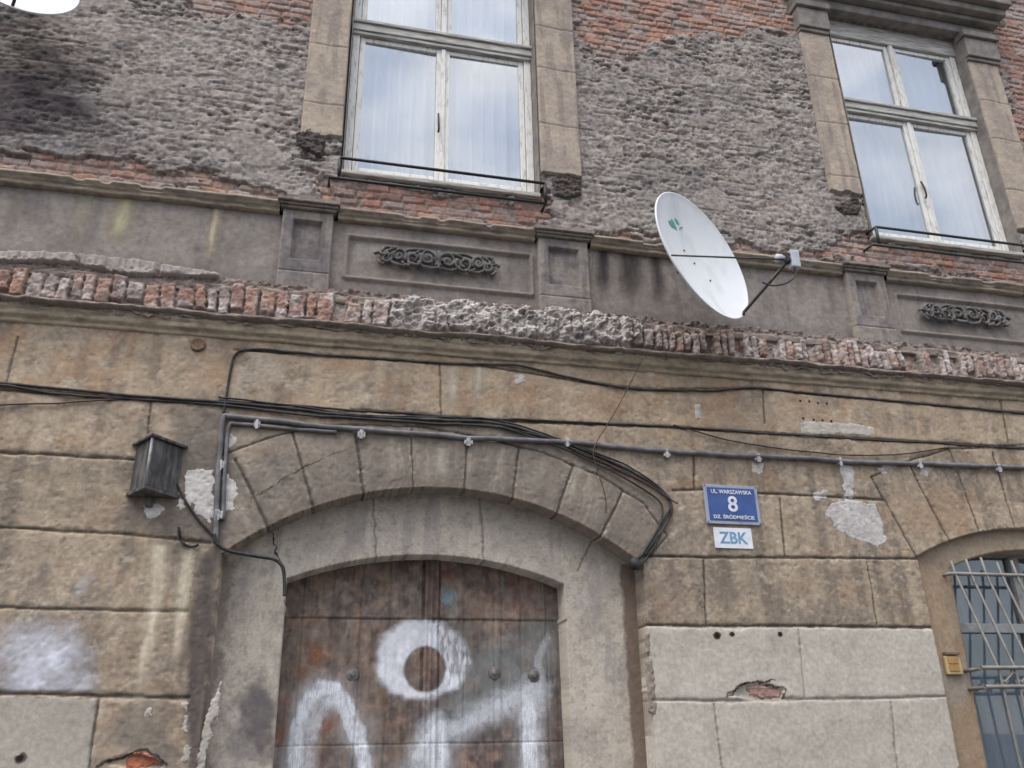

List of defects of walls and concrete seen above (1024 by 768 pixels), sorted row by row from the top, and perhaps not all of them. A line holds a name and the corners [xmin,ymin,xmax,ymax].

flaking render [187,0,313,32]
spalling [296,128,326,159]
flaking render [0,151,285,199]
spalling [834,197,861,216]
peeling [752,462,764,475]
peeling [143,468,239,523]
peeling [813,464,887,547]
spalling [727,680,786,700]
spalling [96,748,167,768]